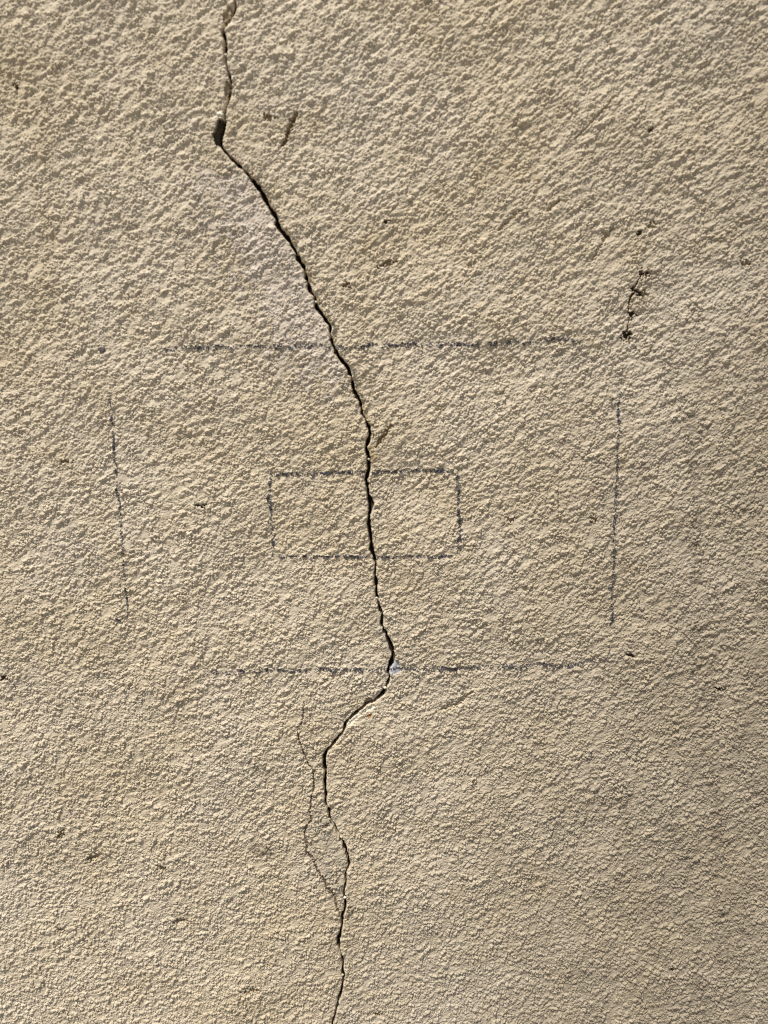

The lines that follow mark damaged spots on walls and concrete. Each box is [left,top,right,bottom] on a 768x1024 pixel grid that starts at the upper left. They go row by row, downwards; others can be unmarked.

crack [210,8,395,1024]